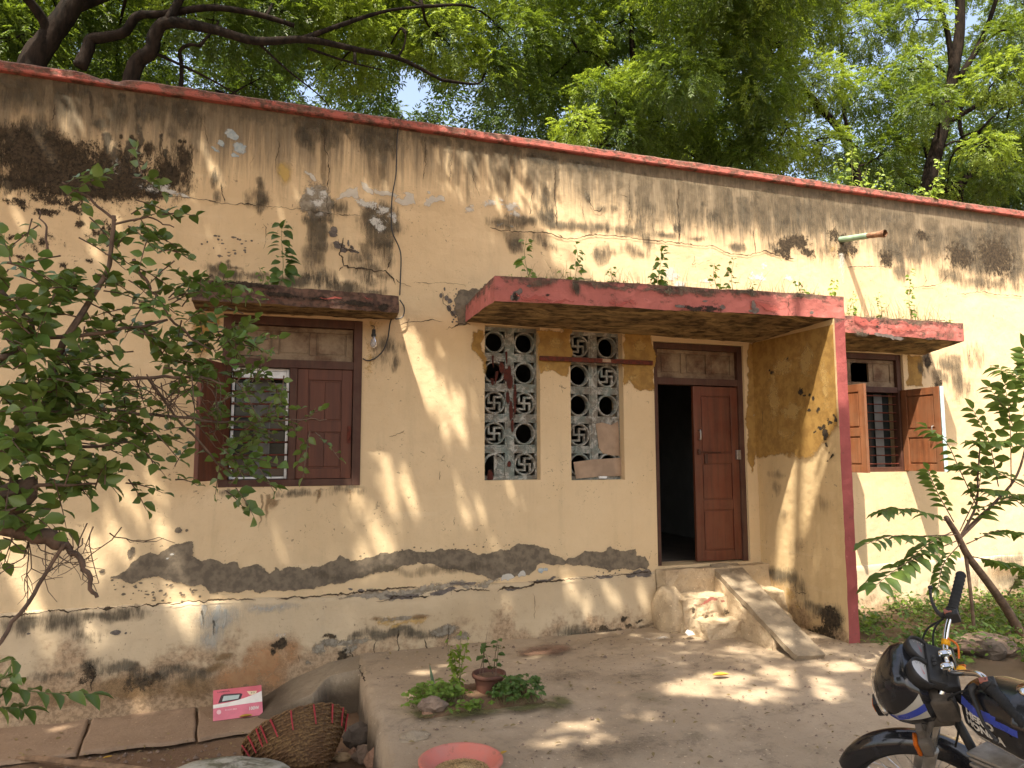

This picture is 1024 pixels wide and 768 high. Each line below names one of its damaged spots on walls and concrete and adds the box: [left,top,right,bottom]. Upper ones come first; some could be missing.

leakage [0,74,198,263]
crack [132,126,469,328]
peeling [306,187,359,217]
leakage [491,145,1024,290]
spalling [439,287,458,323]
peeling [769,346,837,462]
leakage [5,605,143,637]
crack [1,586,428,618]
peeling [99,527,651,602]
crack [454,571,651,618]
leakage [769,569,844,640]
leakage [44,660,212,698]